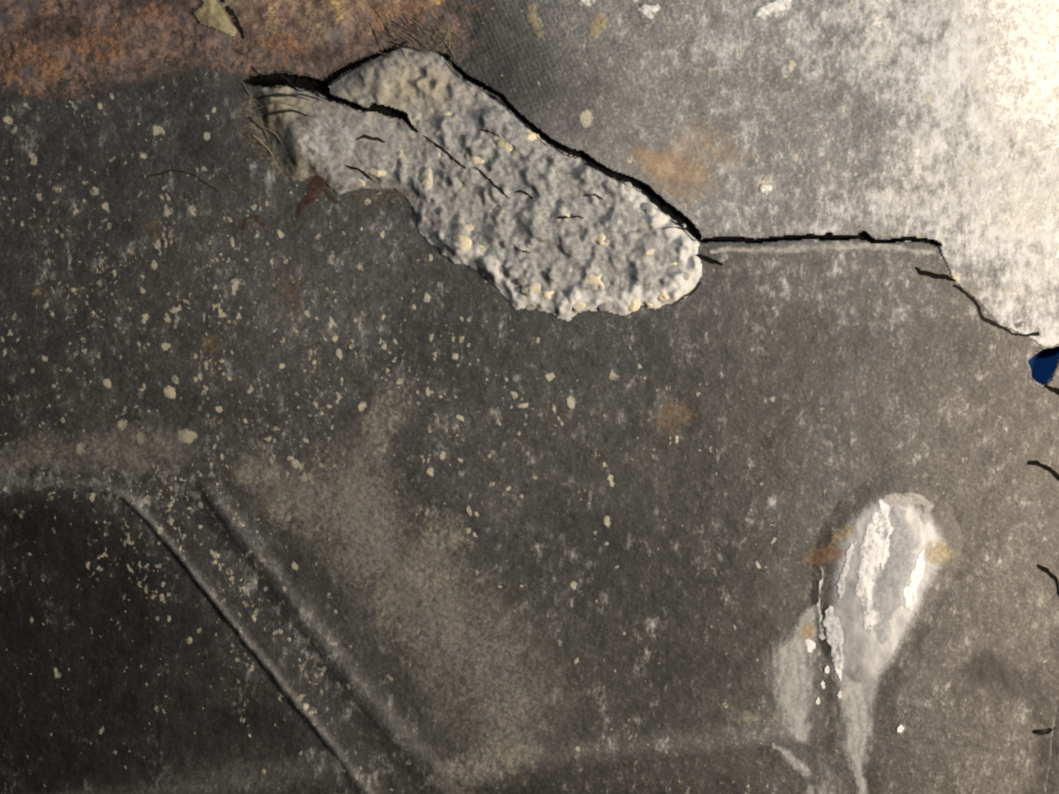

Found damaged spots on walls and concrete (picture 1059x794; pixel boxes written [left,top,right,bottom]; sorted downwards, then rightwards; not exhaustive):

crack [194,0,244,39]
corrosion [0,0,477,99]
crack [236,2,1040,337]
crack [1044,384,1059,395]
crack [1028,460,1059,481]
damp [884,493,933,523]
crack [1037,564,1059,596]
damp [743,605,819,742]
damp [841,671,873,794]
crack [1033,727,1056,735]
damp [772,743,833,794]